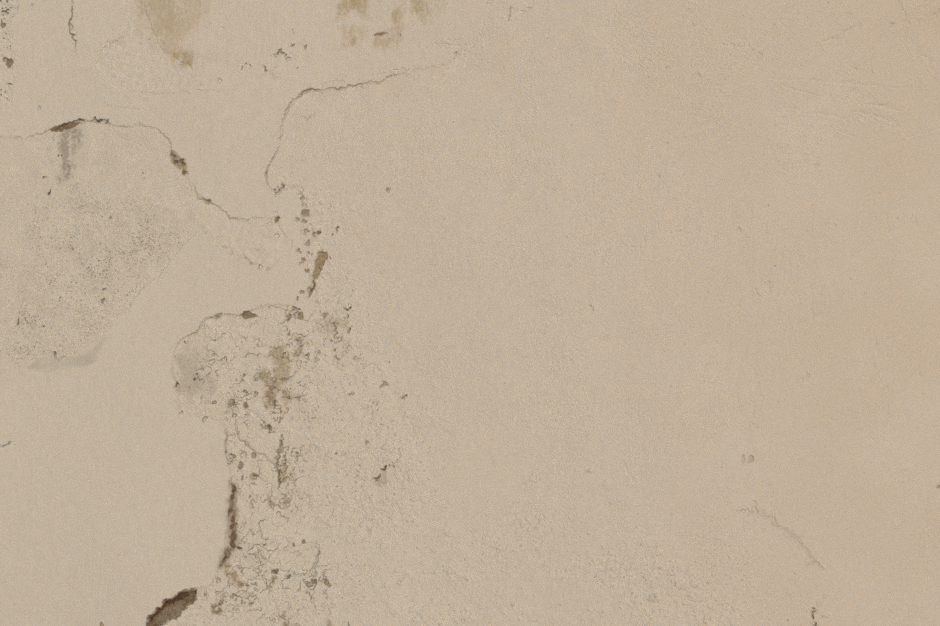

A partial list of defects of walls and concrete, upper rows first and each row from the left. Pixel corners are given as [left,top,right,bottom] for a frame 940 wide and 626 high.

spalling [0,0,24,107]
damp [132,0,212,73]
crack [260,6,513,196]
damp [335,0,448,53]
spalling [0,117,461,626]